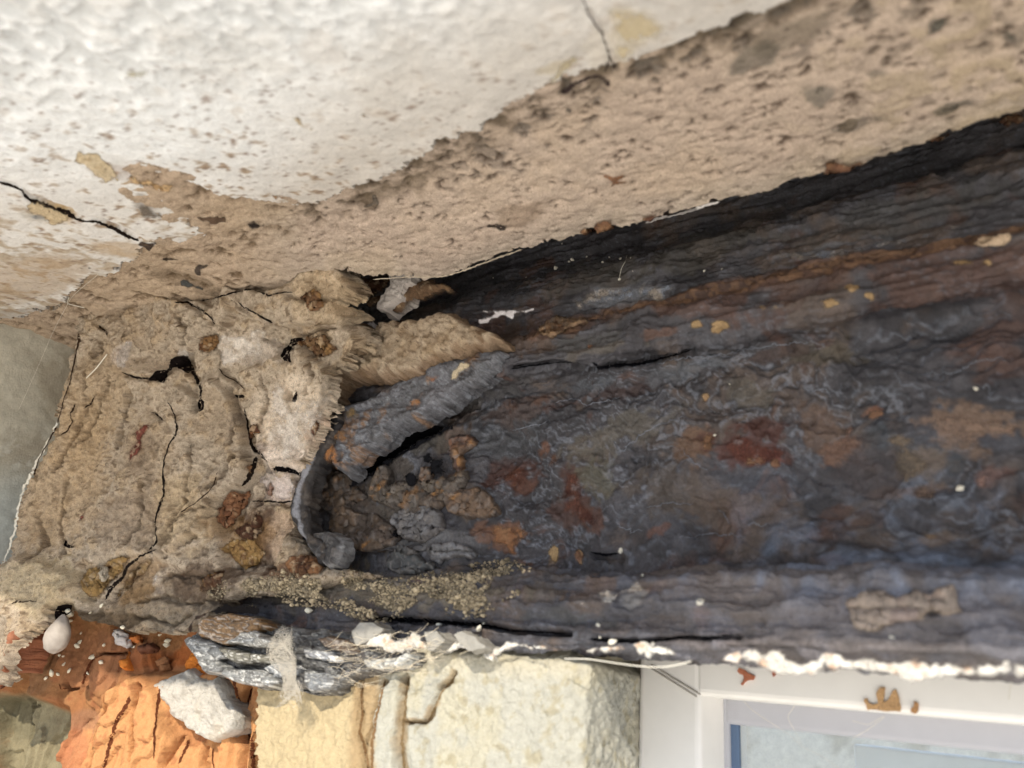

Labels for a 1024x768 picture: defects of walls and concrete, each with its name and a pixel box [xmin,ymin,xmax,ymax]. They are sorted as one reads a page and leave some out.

corrosion [999,112,1024,127]
crack [0,181,139,241]
spalling [0,0,1024,352]
corrosion [580,221,615,236]
crack [175,288,292,324]
corrosion [691,320,729,333]
crack [34,325,108,475]
crack [105,402,217,600]
spalling [0,268,383,689]
crack [122,355,301,504]
spalling [347,425,453,506]
corrosion [845,584,964,632]